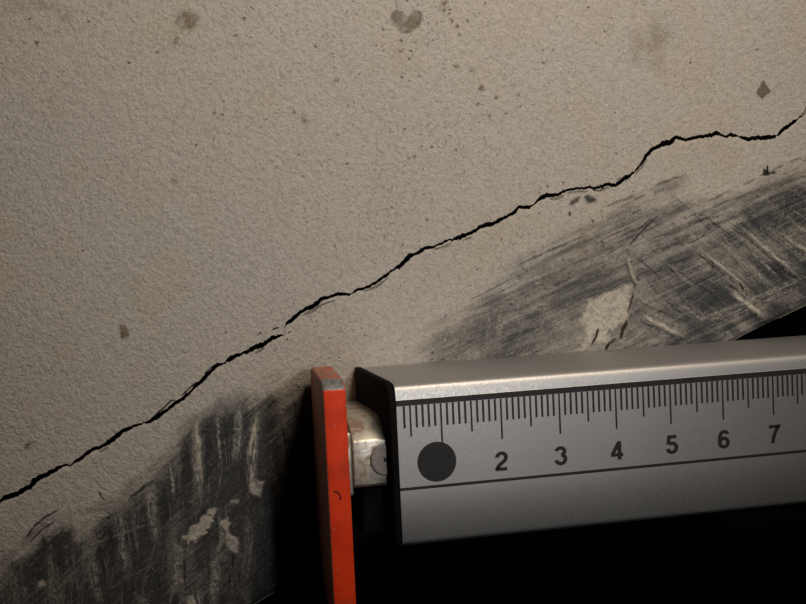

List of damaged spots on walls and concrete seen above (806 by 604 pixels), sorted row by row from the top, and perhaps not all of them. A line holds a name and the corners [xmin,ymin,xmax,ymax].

crack [0,107,806,503]